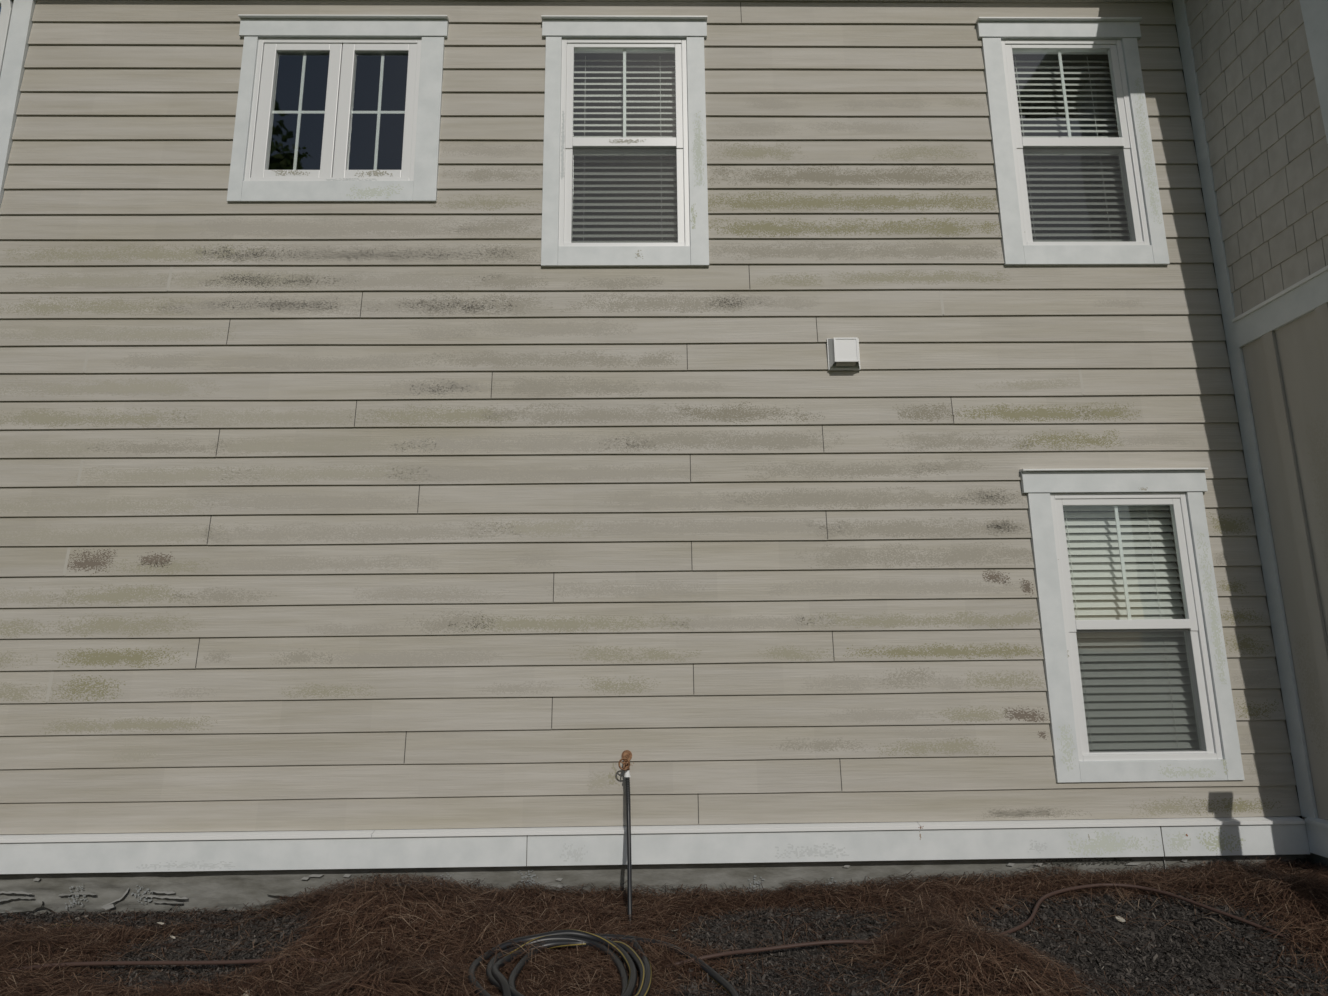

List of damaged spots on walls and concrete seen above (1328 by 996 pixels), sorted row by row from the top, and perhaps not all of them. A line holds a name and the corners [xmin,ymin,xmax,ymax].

mould [707,165,995,186]
water stain [67,548,117,574]
water stain [1002,706,1050,740]
mould [977,807,1092,819]